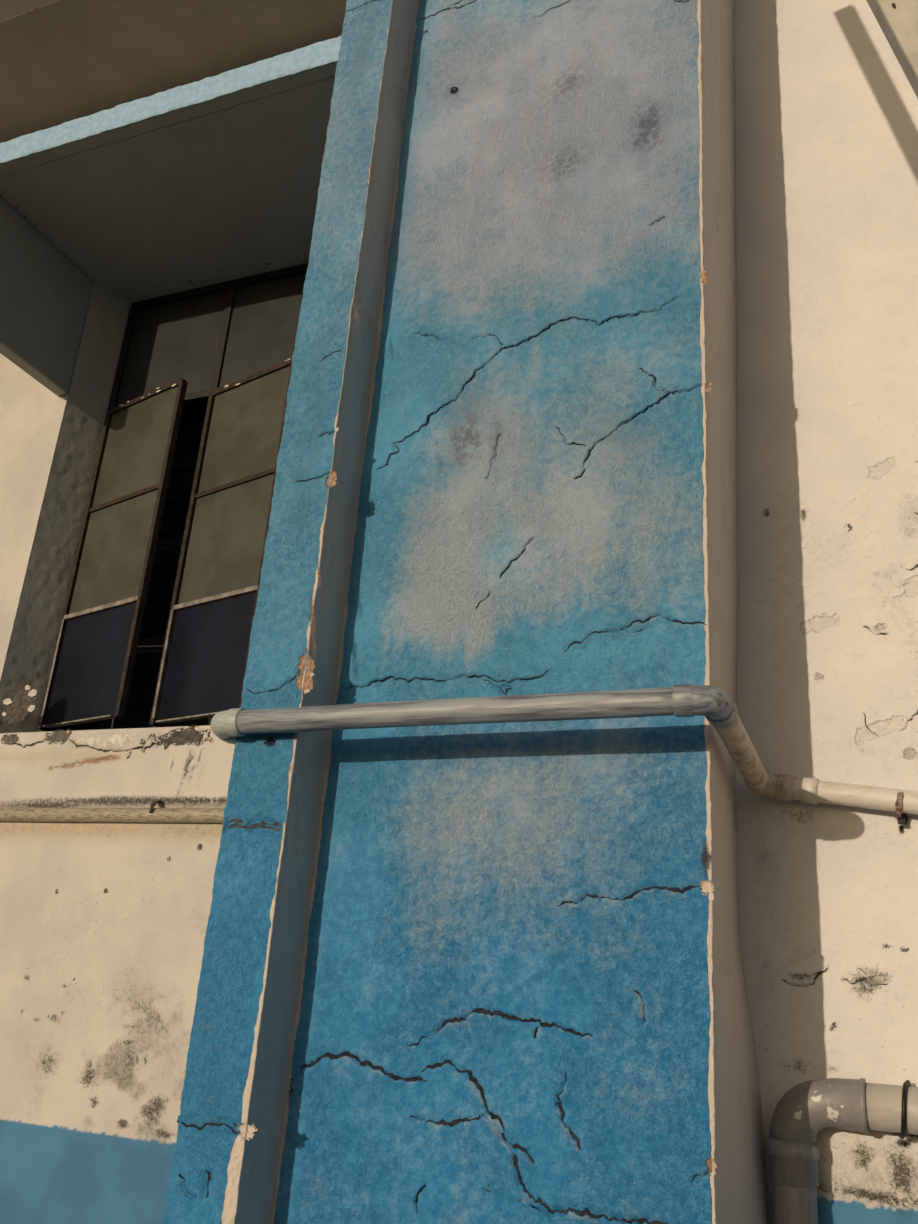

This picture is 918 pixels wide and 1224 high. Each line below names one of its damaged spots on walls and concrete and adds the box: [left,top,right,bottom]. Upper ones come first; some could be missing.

crack [376,293,677,470]
crack [556,368,706,479]
spalling [295,648,315,694]
crack [340,615,707,695]
spalling [43,729,72,745]
spalling [140,725,213,751]
peeling [903,747,917,759]
crack [555,885,714,915]
water stain [856,971,888,996]
water stain [142,1098,170,1138]
crack [286,1008,668,1224]
water stain [821,1132,918,1206]